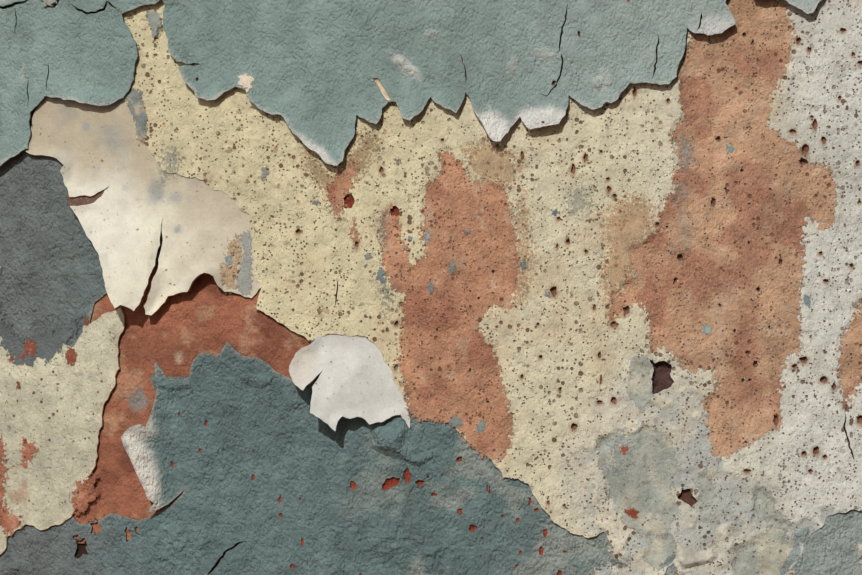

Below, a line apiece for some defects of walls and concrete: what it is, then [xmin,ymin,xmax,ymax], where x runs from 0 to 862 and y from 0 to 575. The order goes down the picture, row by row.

crack [0,0,28,25]
peeling [0,0,522,555]
peeling [163,0,841,461]
peeling [820,298,862,424]
peeling [73,535,88,559]
peeling [595,423,718,575]
peeling [731,484,795,575]